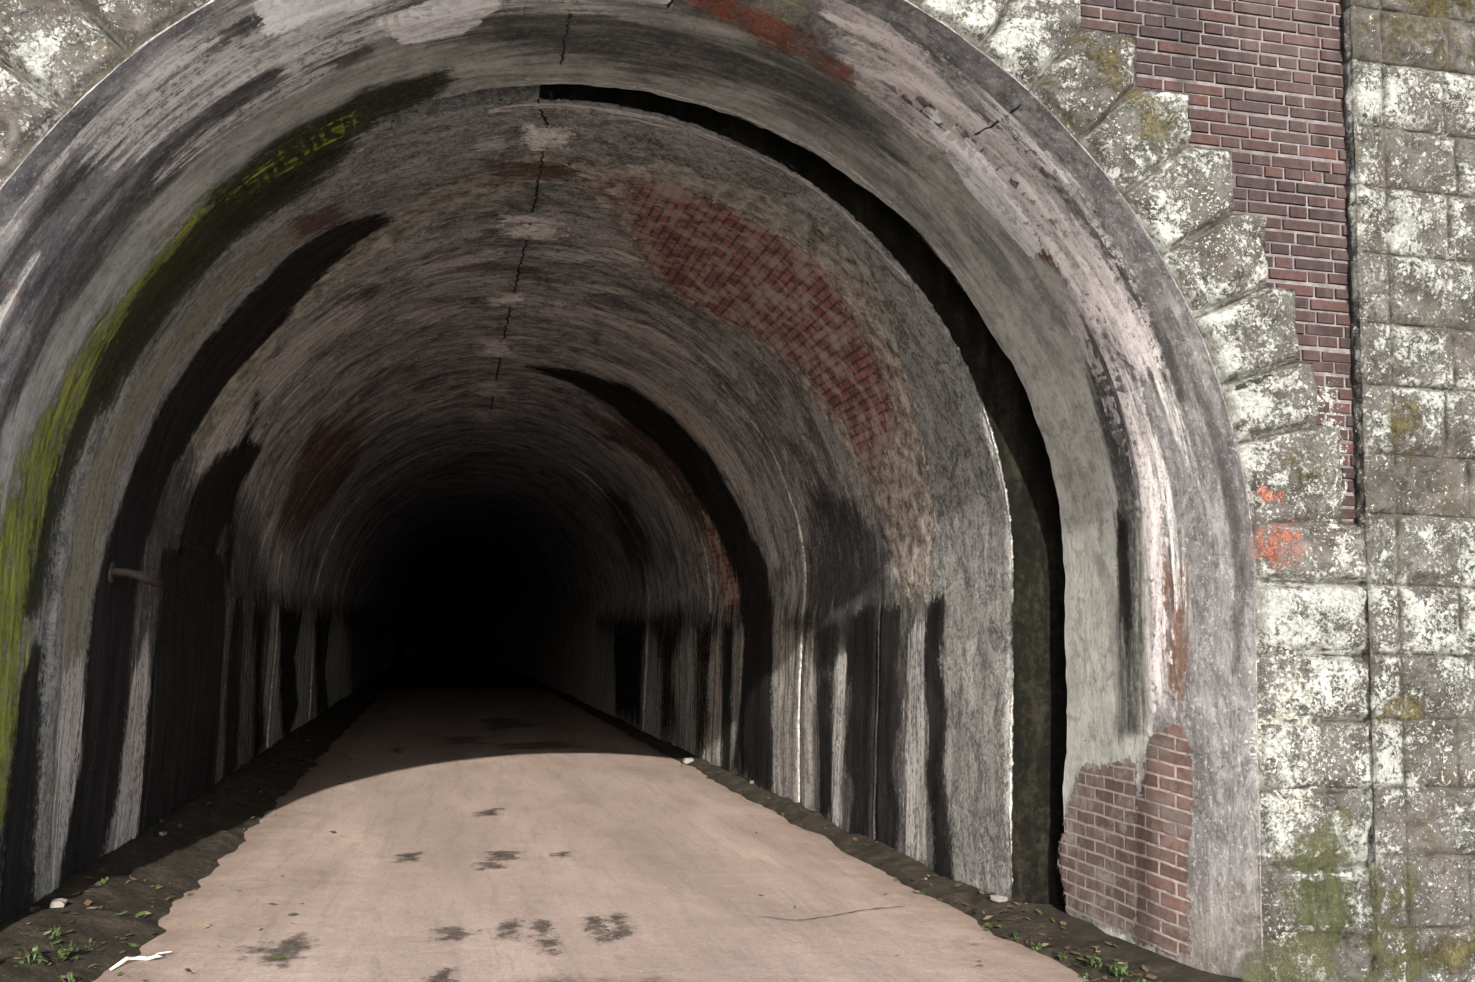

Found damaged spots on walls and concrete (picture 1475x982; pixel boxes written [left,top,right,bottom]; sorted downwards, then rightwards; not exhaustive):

damp [0,212,394,925]
damp [0,0,406,439]
damp [411,248,509,280]
crack [463,0,576,422]
peeling [249,0,856,90]
spalling [185,150,945,622]
damp [438,2,1246,906]
spalling [817,0,1199,958]